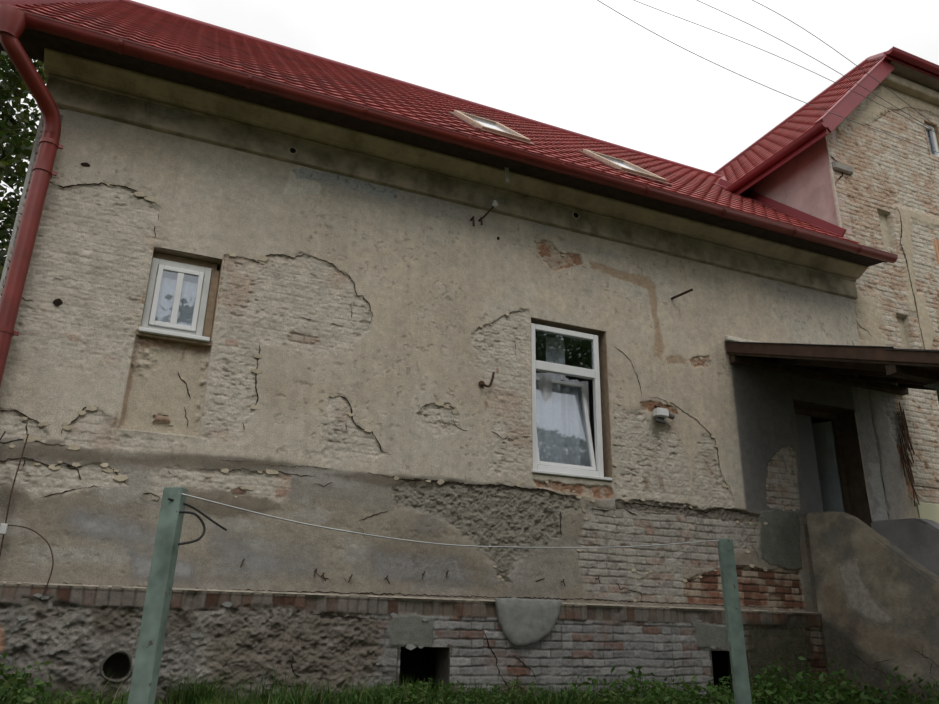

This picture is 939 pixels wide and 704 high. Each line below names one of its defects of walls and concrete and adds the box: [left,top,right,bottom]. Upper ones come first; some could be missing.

flaking render [857,105,939,163]
crack [49,176,159,236]
flaking render [3,179,168,380]
crack [228,254,373,328]
flaking render [0,251,373,504]
crack [243,345,260,429]
crack [0,406,160,501]
crack [203,460,332,487]
crack [338,346,765,545]
flaking render [391,306,806,611]
flaking render [17,593,95,655]
flaking render [191,602,381,696]